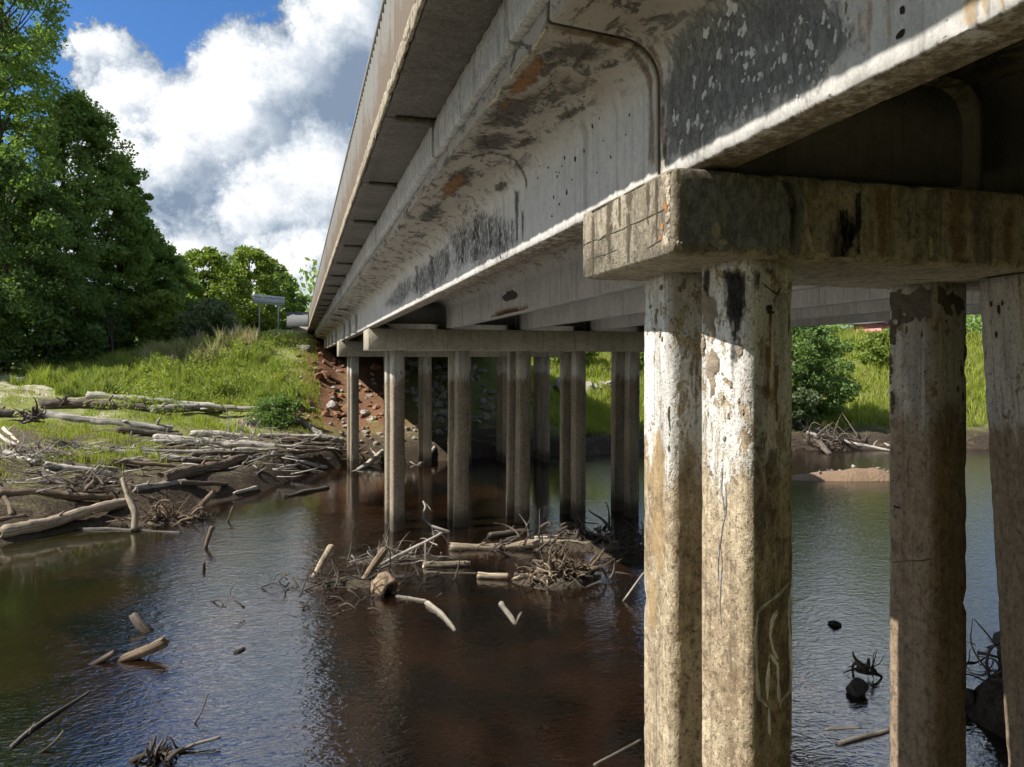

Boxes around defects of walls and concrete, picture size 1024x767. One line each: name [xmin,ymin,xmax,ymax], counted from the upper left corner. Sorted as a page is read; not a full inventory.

rust [501,55,545,112]
water stain [557,106,585,121]
water stain [543,42,607,65]
water stain [659,0,865,165]
water stain [383,83,566,309]
water stain [681,171,879,258]
water stain [723,268,773,366]
peeling [889,285,965,415]
crack [717,465,727,633]